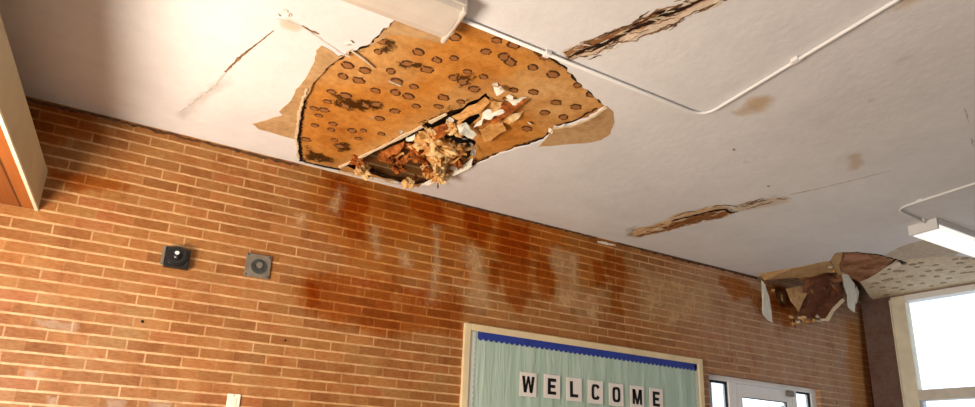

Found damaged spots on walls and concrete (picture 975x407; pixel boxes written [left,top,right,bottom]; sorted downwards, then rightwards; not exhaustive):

crack [564,0,727,60]
crack [26,10,353,167]
spalling [253,20,614,189]
crack [422,171,888,279]
flaking render [789,315,825,326]
peeling [860,240,975,299]